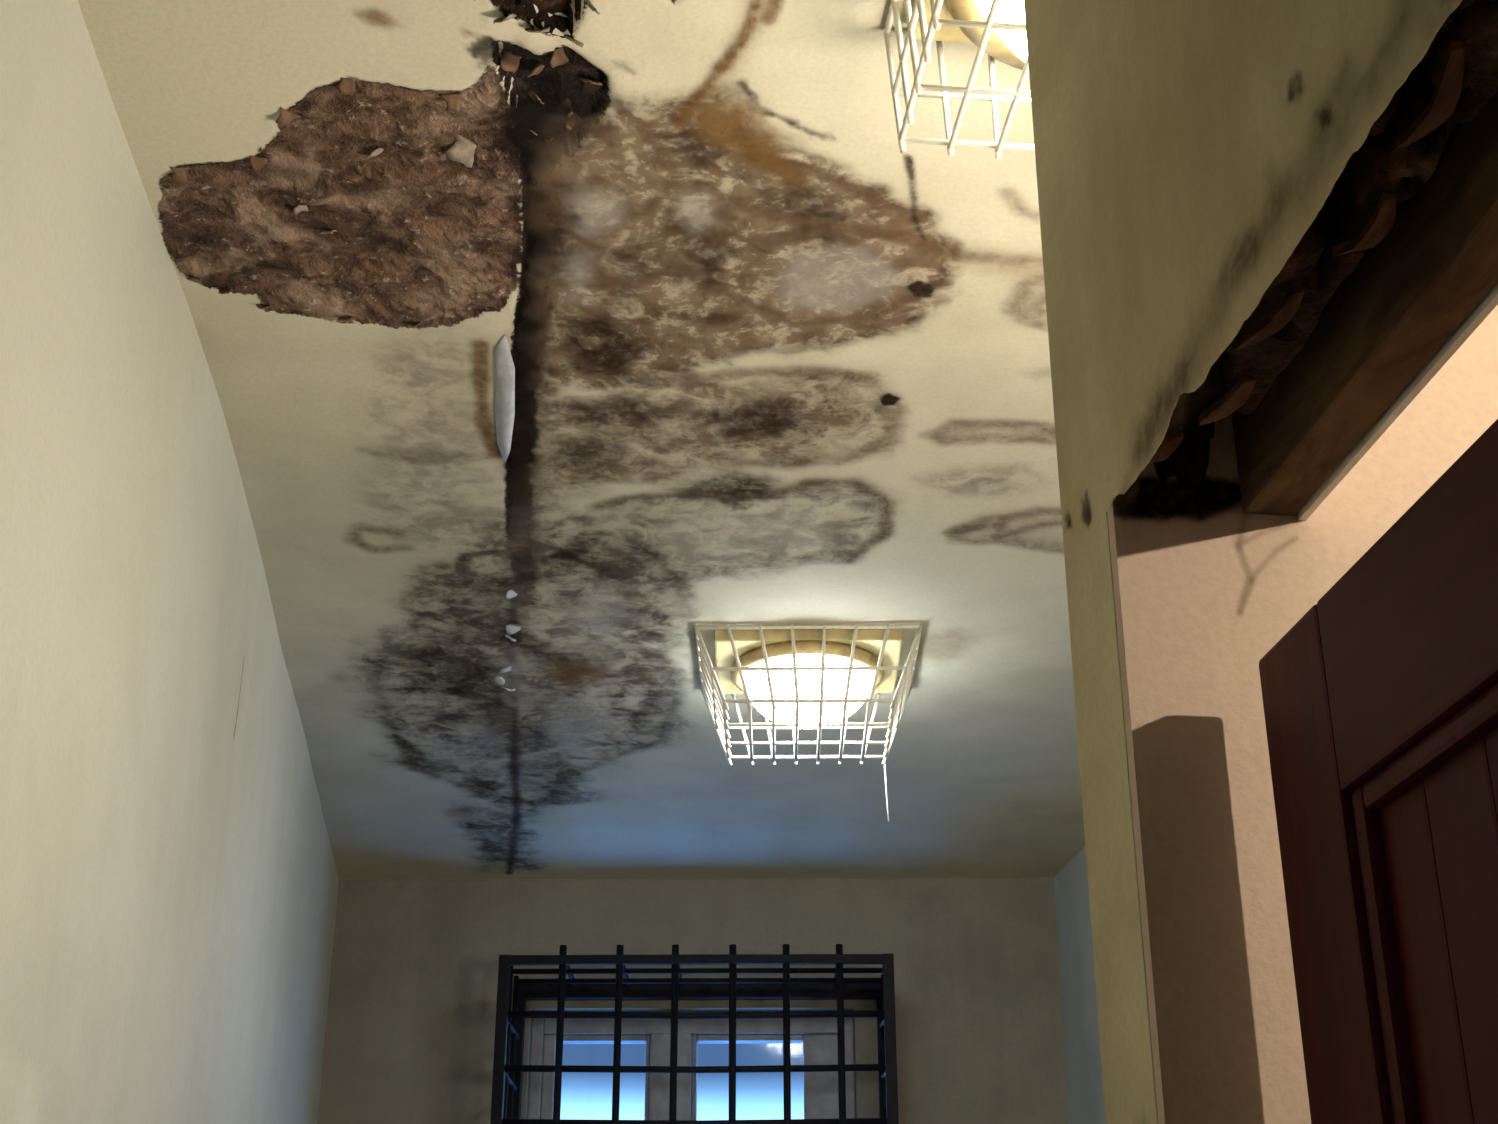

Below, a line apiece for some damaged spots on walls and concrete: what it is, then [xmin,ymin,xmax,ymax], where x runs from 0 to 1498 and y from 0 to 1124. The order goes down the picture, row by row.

spalling [474,0,600,48]
spalling [157,65,523,329]
peeling [474,334,515,463]
crack [455,37,612,874]
water stain [361,93,956,869]